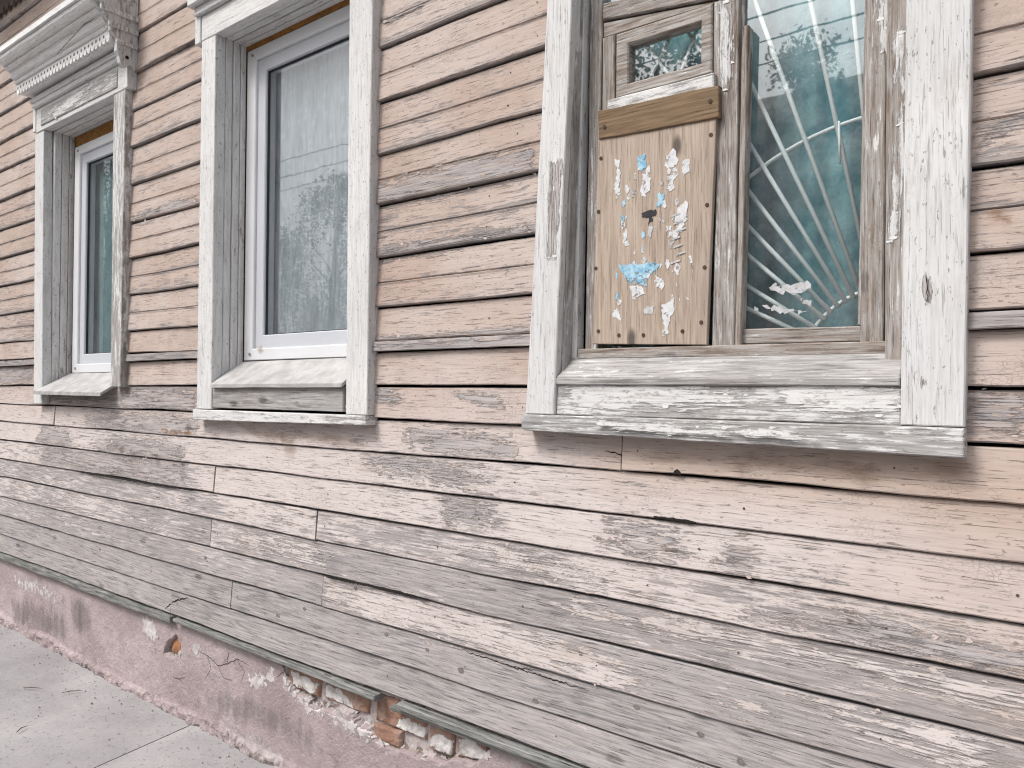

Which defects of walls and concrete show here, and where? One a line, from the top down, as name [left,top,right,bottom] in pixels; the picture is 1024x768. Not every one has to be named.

peeling [876,0,906,245]
peeling [557,385,820,446]
peeling [775,385,901,424]
spalling [142,615,203,662]
crack [174,650,246,681]
peeling [233,528,647,695]
crack [465,650,587,691]
peeling [360,424,1024,768]
spalling [246,663,493,765]